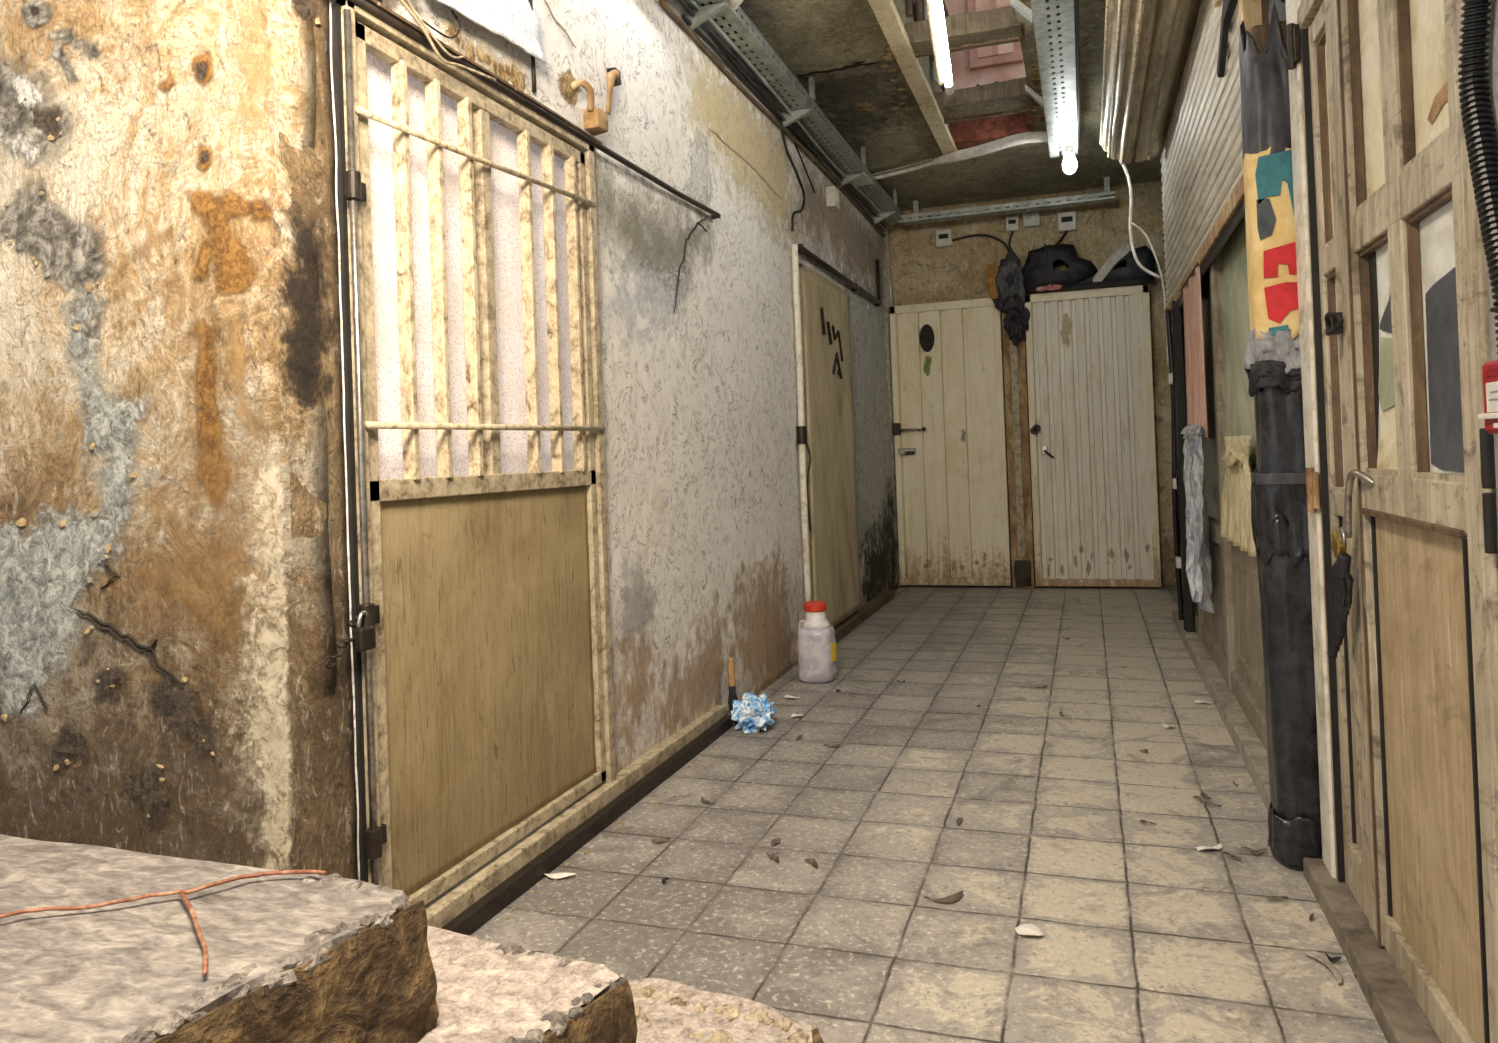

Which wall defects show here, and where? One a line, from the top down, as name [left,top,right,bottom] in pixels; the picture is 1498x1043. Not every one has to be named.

flaking render [0,58,71,161]
spalling [49,28,101,81]
water stain [280,207,338,422]
flaking render [0,183,153,722]
water stain [859,473,899,603]
crack [20,652,64,714]
crack [63,562,184,685]